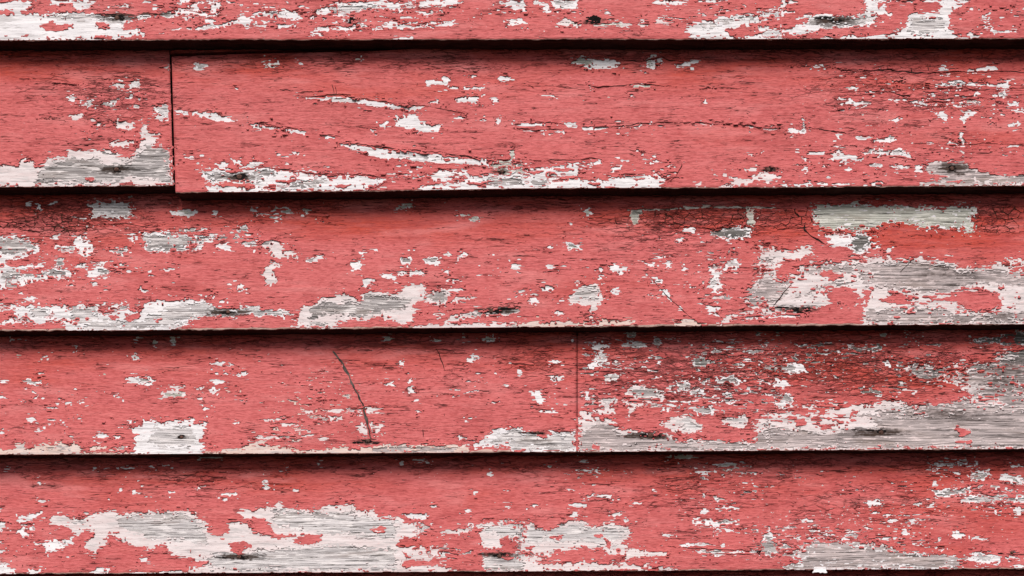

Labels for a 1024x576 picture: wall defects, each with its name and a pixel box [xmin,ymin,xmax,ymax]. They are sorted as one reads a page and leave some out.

peeling [0,0,1024,40]
peeling [192,60,212,76]
peeling [0,69,706,215]
crack [332,350,374,441]
peeling [0,195,1024,574]